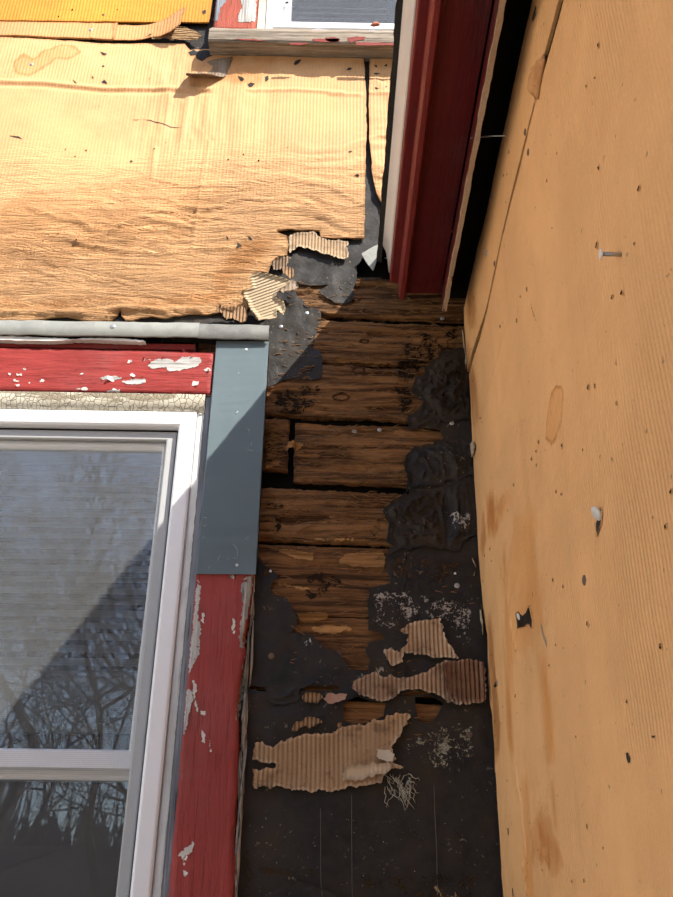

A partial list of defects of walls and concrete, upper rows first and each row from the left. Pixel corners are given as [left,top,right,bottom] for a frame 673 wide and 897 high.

peeling [213,0,226,23]
peeling [238,0,257,22]
peeling [101,348,212,393]
peeling [188,580,202,673]
peeling [230,573,255,721]
peeling [183,688,194,735]
peeling [178,841,194,876]